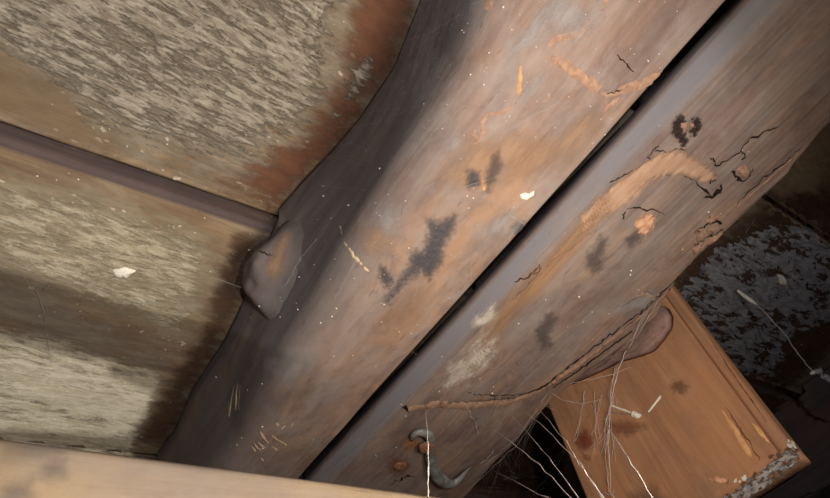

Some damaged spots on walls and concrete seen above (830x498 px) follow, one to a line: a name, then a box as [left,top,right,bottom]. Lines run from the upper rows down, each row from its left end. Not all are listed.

water stain [244,0,413,208]
water stain [468,157,501,186]
crack [622,207,665,220]
crack [610,146,686,183]
crack [666,126,800,255]
water stain [380,217,455,301]
water stain [676,189,830,414]